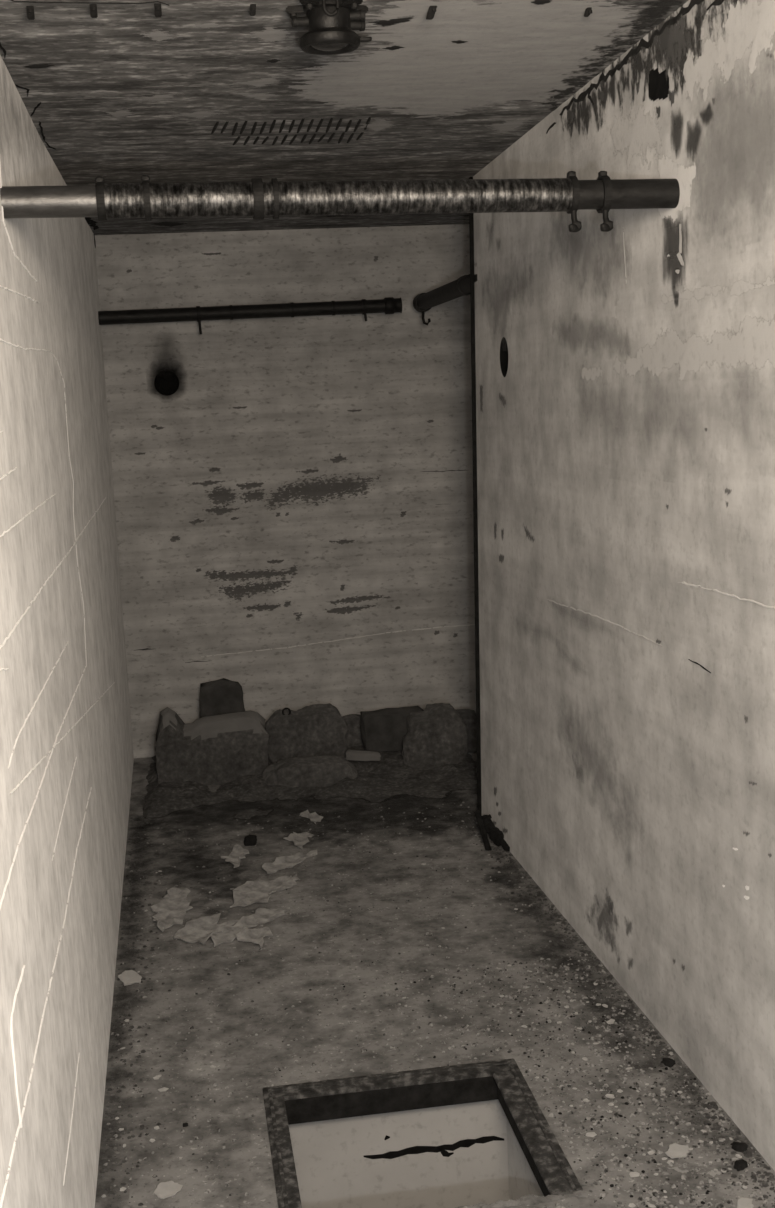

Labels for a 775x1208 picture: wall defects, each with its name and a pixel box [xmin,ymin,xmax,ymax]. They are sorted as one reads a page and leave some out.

leakage [589,897,632,949]